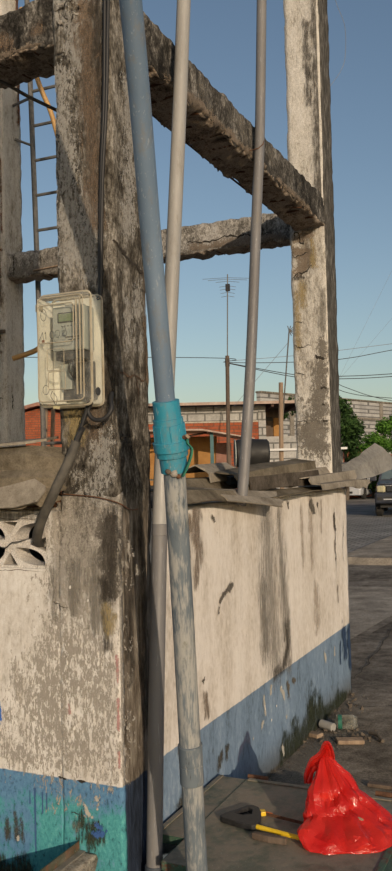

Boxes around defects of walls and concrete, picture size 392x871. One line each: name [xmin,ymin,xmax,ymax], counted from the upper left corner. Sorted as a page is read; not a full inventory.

spalling [186,87,316,280]
crack [187,224,272,243]
crack [293,232,312,278]
damp [54,0,149,737]
peeling [0,493,139,826]
damp [259,505,296,700]
damp [340,620,352,669]
damp [278,681,347,769]
damp [0,788,47,871]
damp [73,809,105,853]